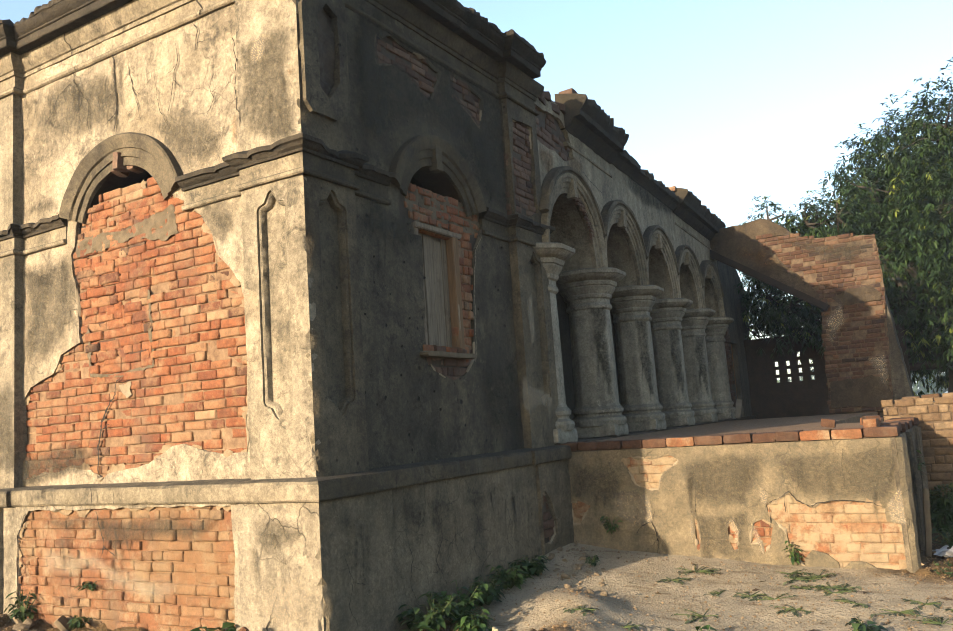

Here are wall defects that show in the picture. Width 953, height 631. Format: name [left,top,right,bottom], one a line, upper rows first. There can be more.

spalling [374,35,436,98]
spalling [527,105,571,162]
spalling [25,165,249,482]
spalling [418,347,474,380]
spalling [621,448,679,491]
spalling [726,493,924,570]
spalling [16,505,235,631]